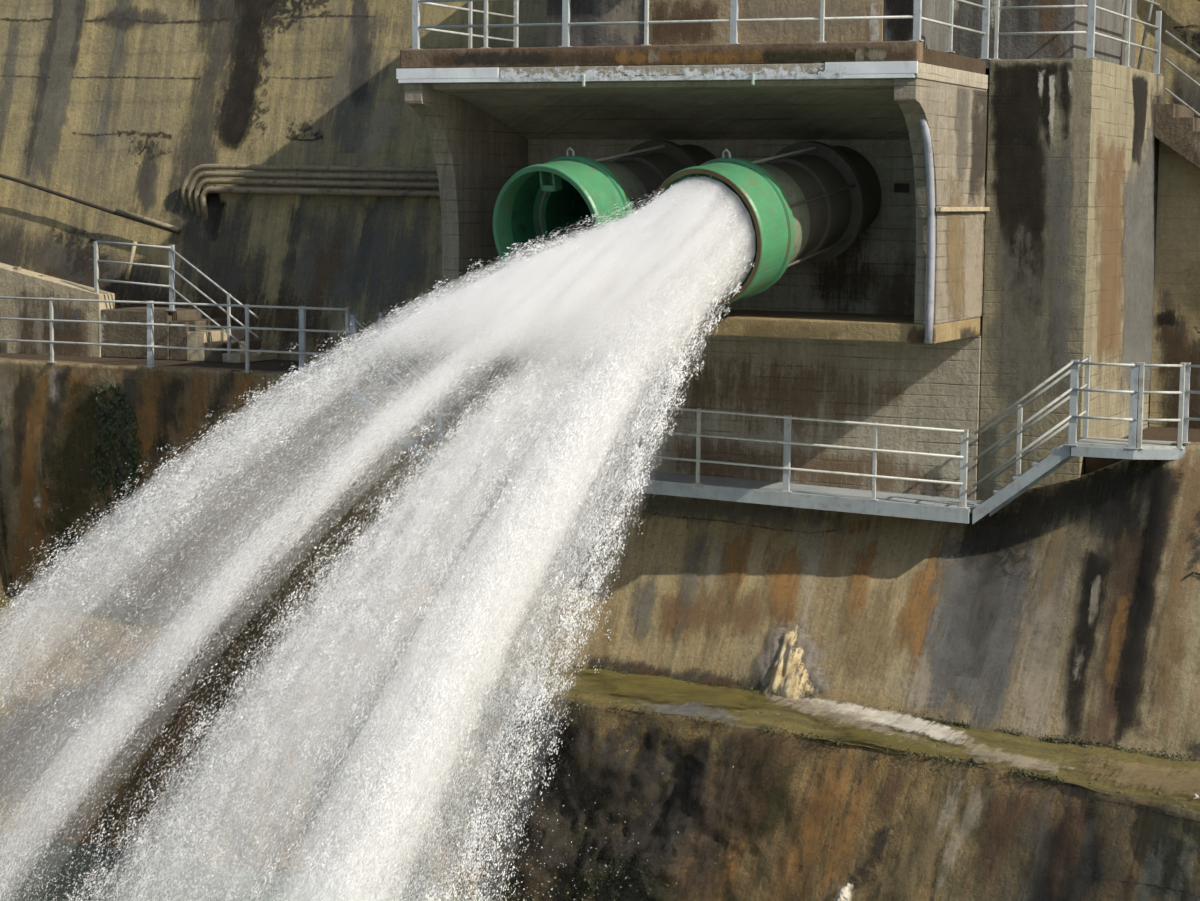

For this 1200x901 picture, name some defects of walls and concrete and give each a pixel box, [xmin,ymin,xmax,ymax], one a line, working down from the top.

water stain [0,0,441,554]
water stain [947,62,1089,401]
water stain [772,460,1183,771]